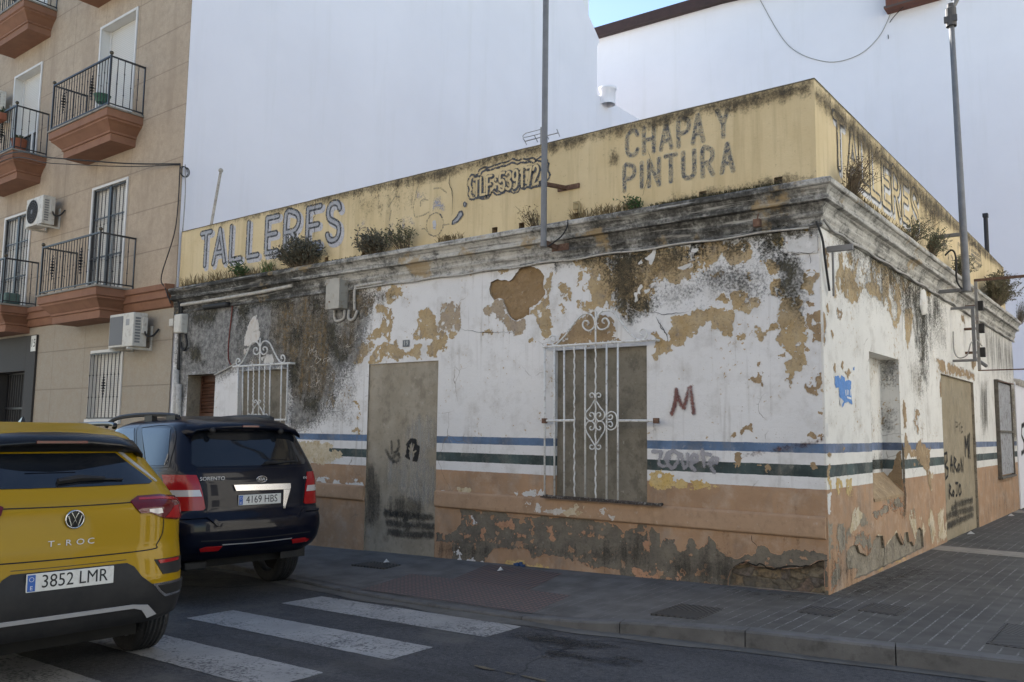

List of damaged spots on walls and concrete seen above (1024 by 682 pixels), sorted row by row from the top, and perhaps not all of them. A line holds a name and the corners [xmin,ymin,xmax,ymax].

damp [244,80,1002,267]
damp [174,289,392,429]
peeling [341,285,461,365]
peeling [482,239,913,397]
damp [839,232,941,395]
flaking render [436,400,947,595]